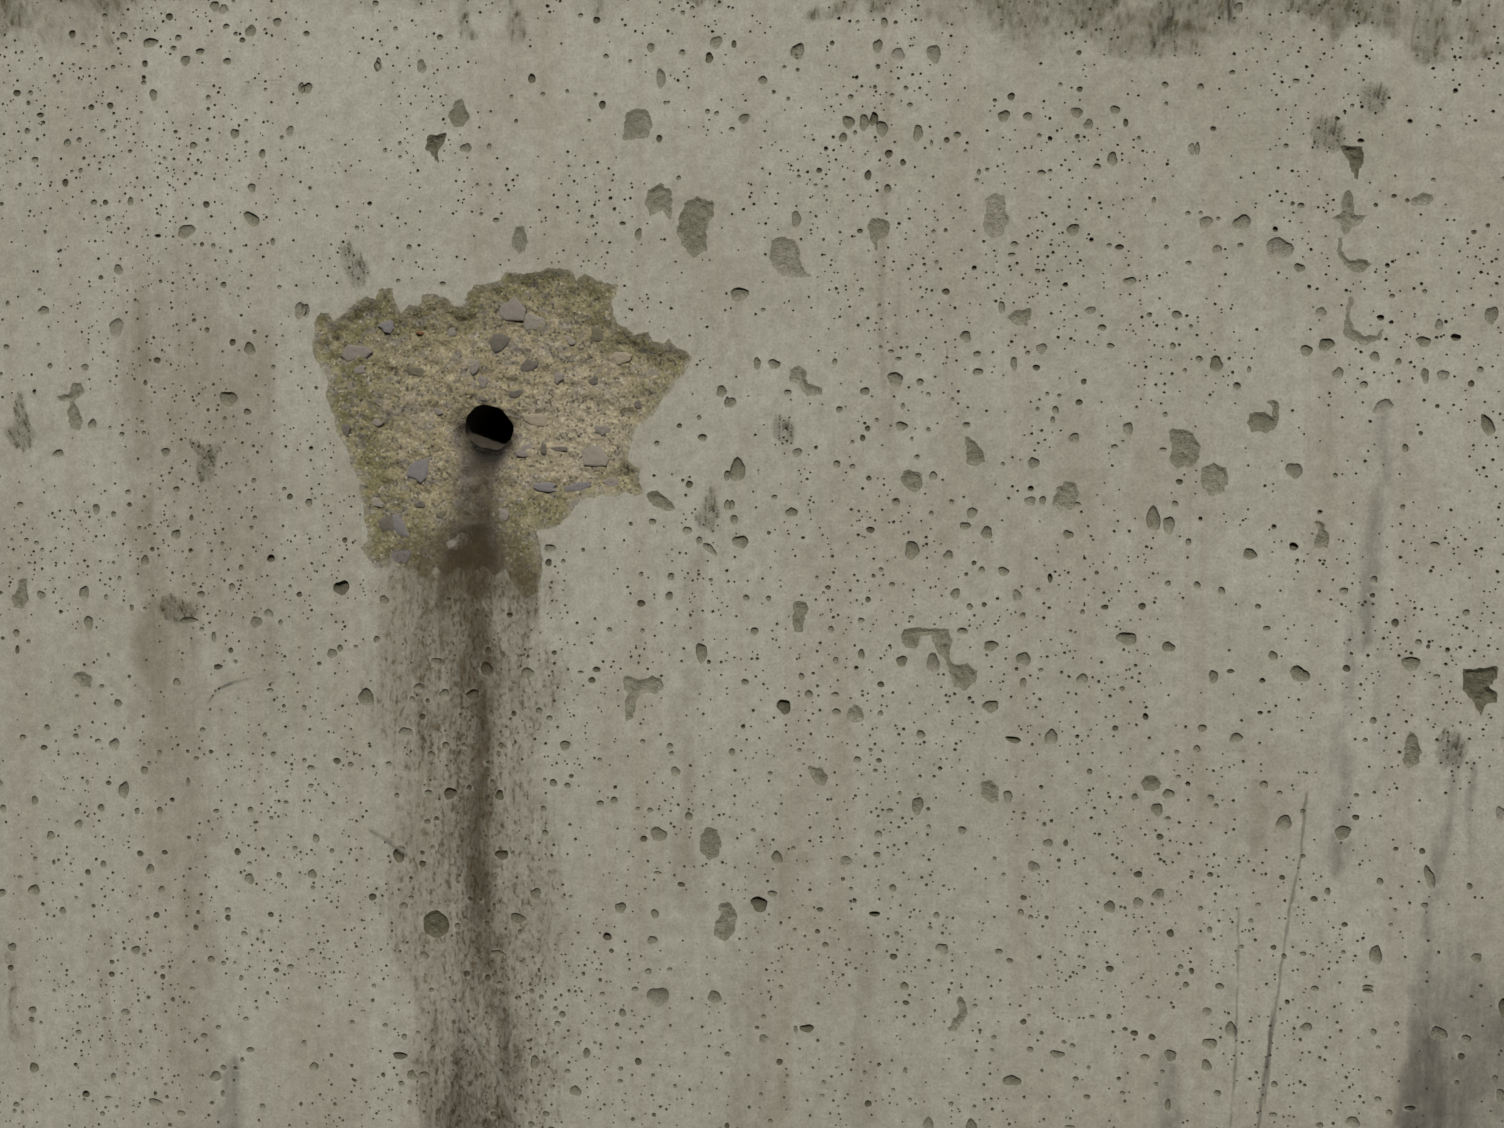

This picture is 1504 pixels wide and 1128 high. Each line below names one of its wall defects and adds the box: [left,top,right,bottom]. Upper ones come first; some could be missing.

damp [1121,0,1236,49]
peeling [512,226,528,254]
spalling [731,287,749,302]
spalling [716,385,737,408]
spalling [295,267,692,599]
spalling [730,456,745,481]
spalling [682,526,717,556]
spalling [730,515,749,549]
damp [377,465,555,1128]